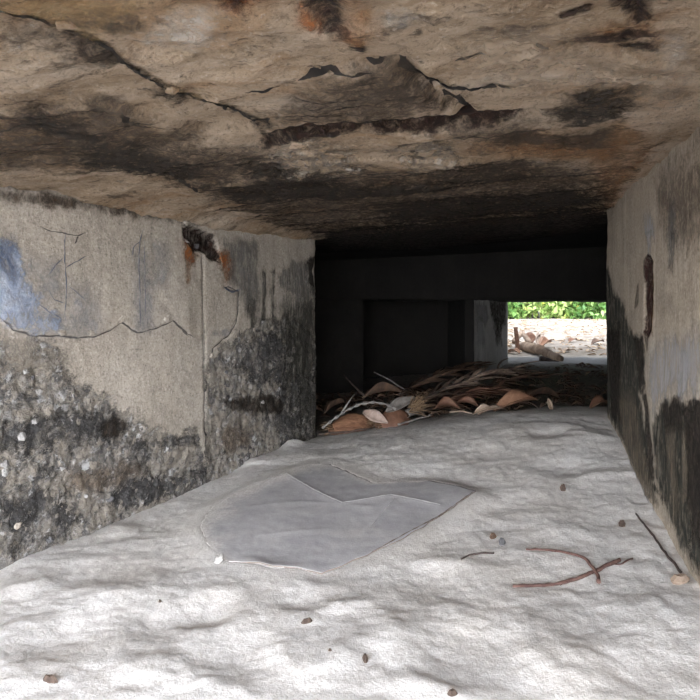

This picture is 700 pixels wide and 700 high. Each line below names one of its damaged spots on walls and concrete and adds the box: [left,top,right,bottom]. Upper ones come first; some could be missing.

damp [0,0,144,67]
crack [0,10,273,133]
crack [247,85,279,93]
damp [276,54,448,127]
crack [298,54,512,106]
crack [455,52,507,61]
crack [171,175,201,193]
rust [183,242,198,284]
spalling [182,221,220,261]
damp [0,81,663,441]
rust [635,254,654,347]
damp [634,336,700,574]